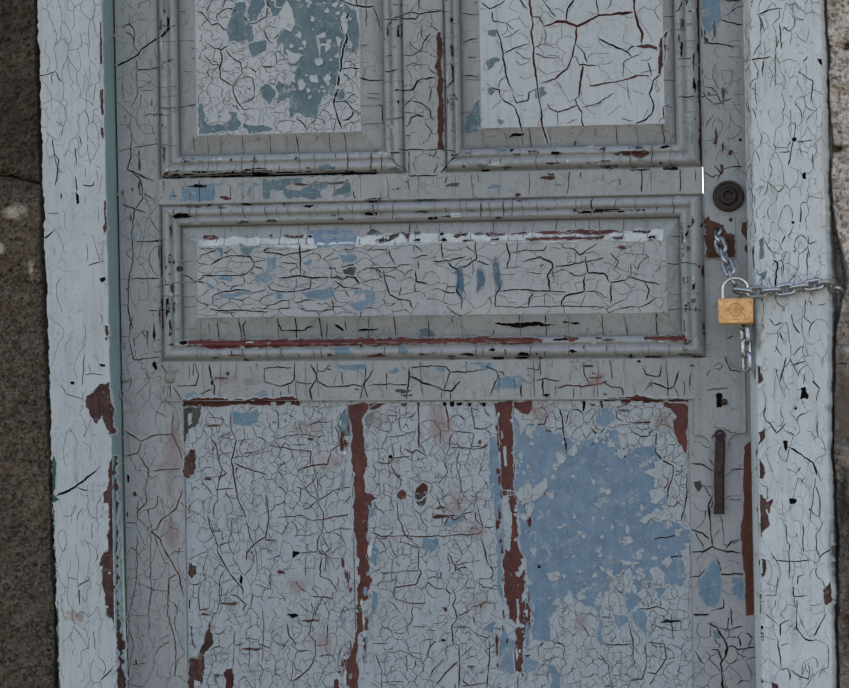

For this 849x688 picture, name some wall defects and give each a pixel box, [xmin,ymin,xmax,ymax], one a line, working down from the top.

crack [0,0,107,266]
crack [48,277,117,688]
peeling [82,381,119,435]
peeling [98,454,138,688]
peeling [225,0,361,120]
peeling [145,254,580,373]
crack [113,0,703,688]
peeling [162,144,666,302]
peeling [180,364,775,688]
peeling [476,131,571,187]
peeling [621,264,706,368]
crack [512,0,831,688]